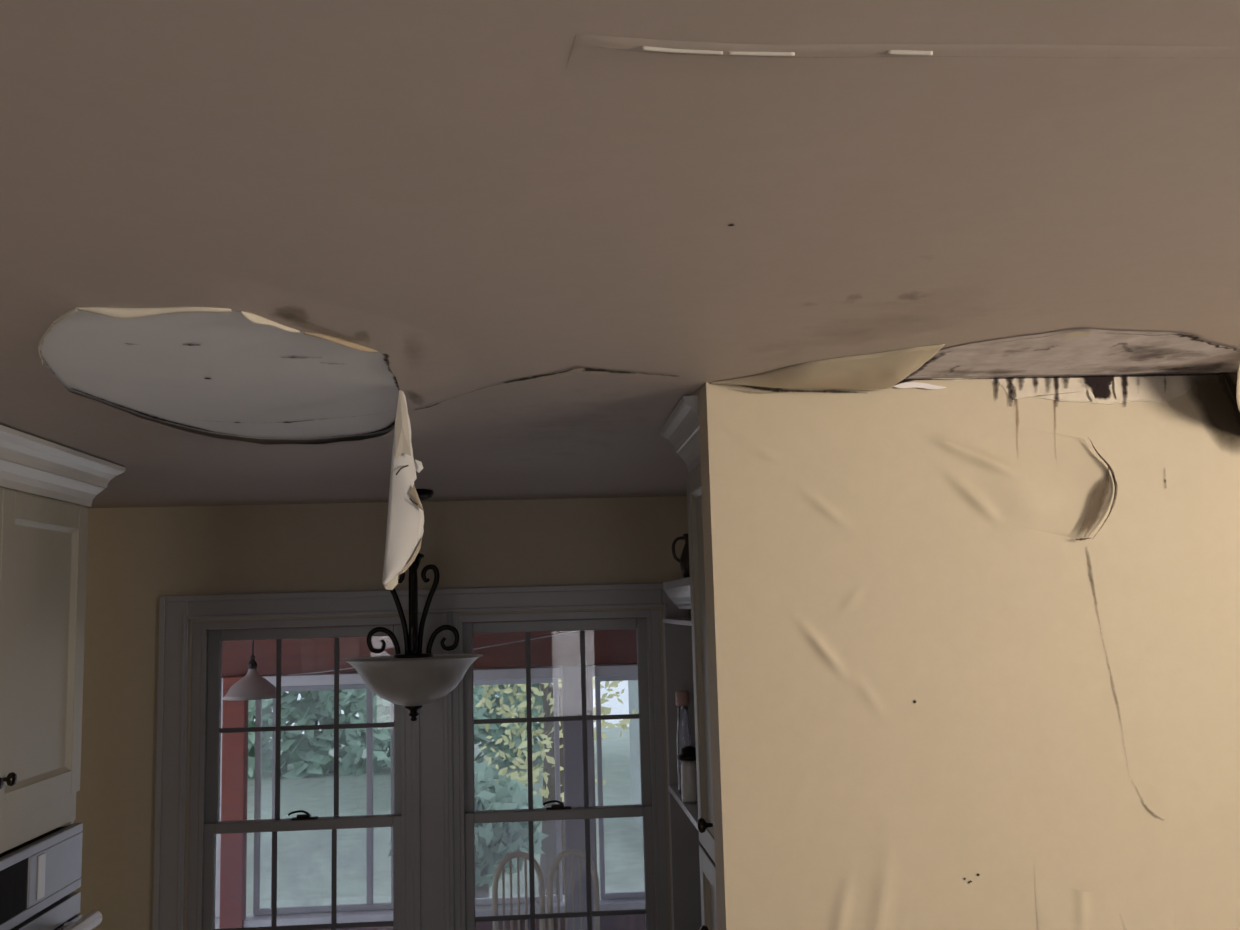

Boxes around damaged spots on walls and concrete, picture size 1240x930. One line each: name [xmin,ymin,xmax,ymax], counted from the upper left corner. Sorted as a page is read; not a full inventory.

crack [504,368,662,383]
peeling [709,344,969,393]
water stain [897,353,1240,446]
peeling [987,375,1195,404]